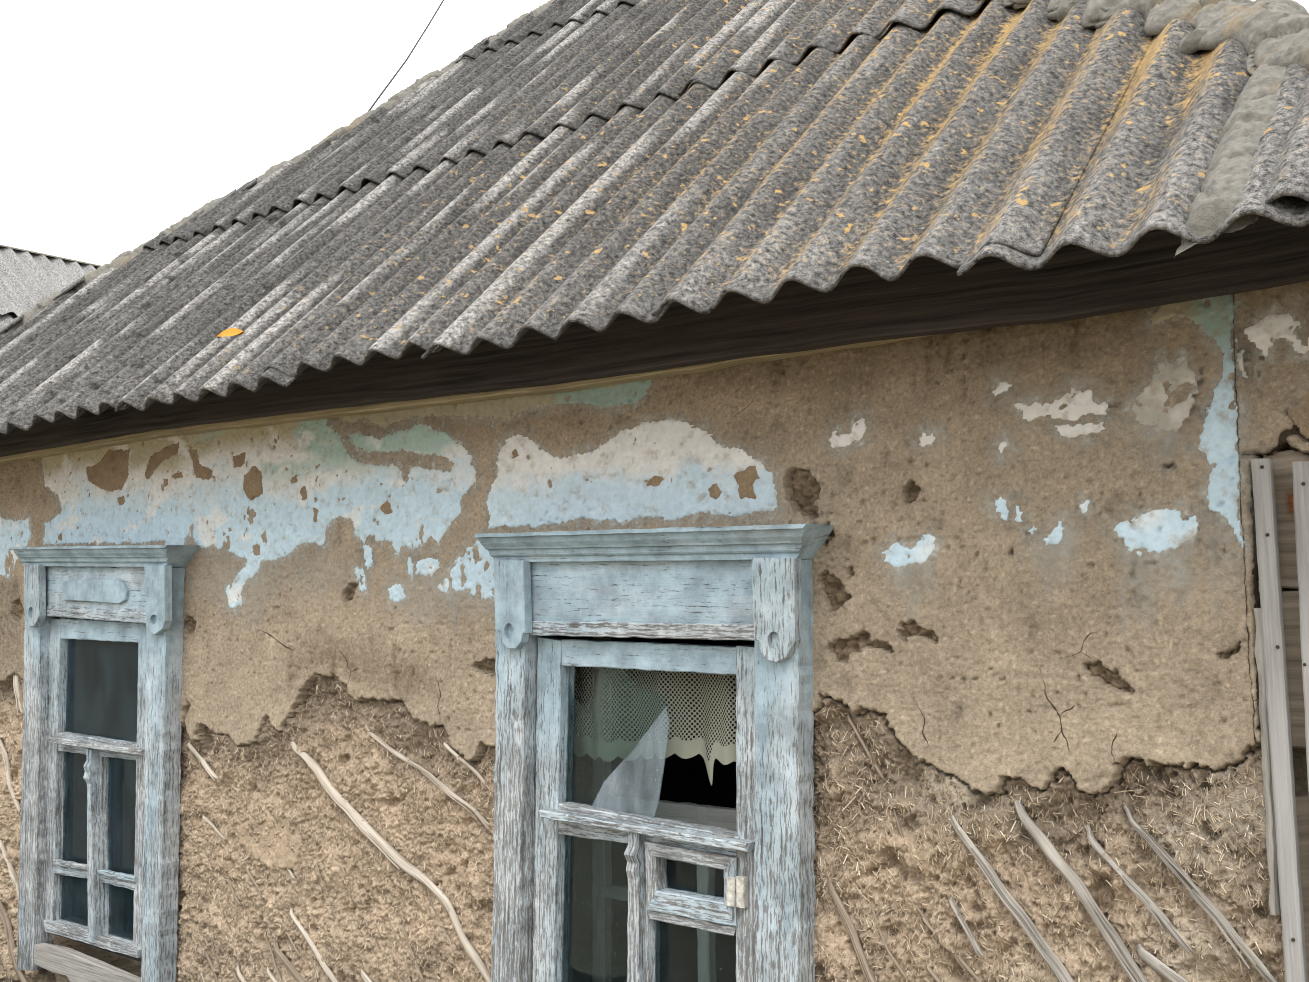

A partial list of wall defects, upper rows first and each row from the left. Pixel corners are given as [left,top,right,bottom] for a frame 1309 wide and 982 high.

spalling [14,601,24,619]
peeling [0,380,821,613]
crack [1040,632,1095,750]
spalling [1089,661,1135,693]
peeling [987,294,1309,564]
crack [1202,294,1309,743]
spalling [0,675,56,982]
spalling [52,934,86,950]
spalling [176,674,495,982]
spalling [811,697,1286,982]